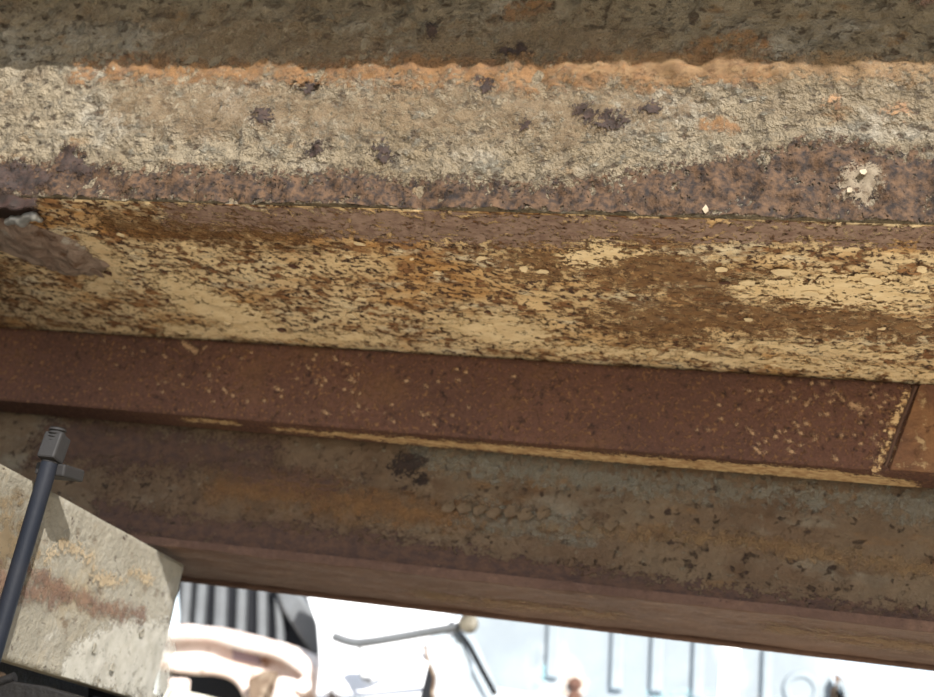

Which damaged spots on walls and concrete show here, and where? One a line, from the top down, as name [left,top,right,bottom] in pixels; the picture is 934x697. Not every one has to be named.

corrosion [0,133,934,348]
peeling [554,238,649,270]
peeling [715,266,934,315]
peeling [144,273,397,369]
corrosion [0,561,10,595]
corrosion [19,566,146,623]